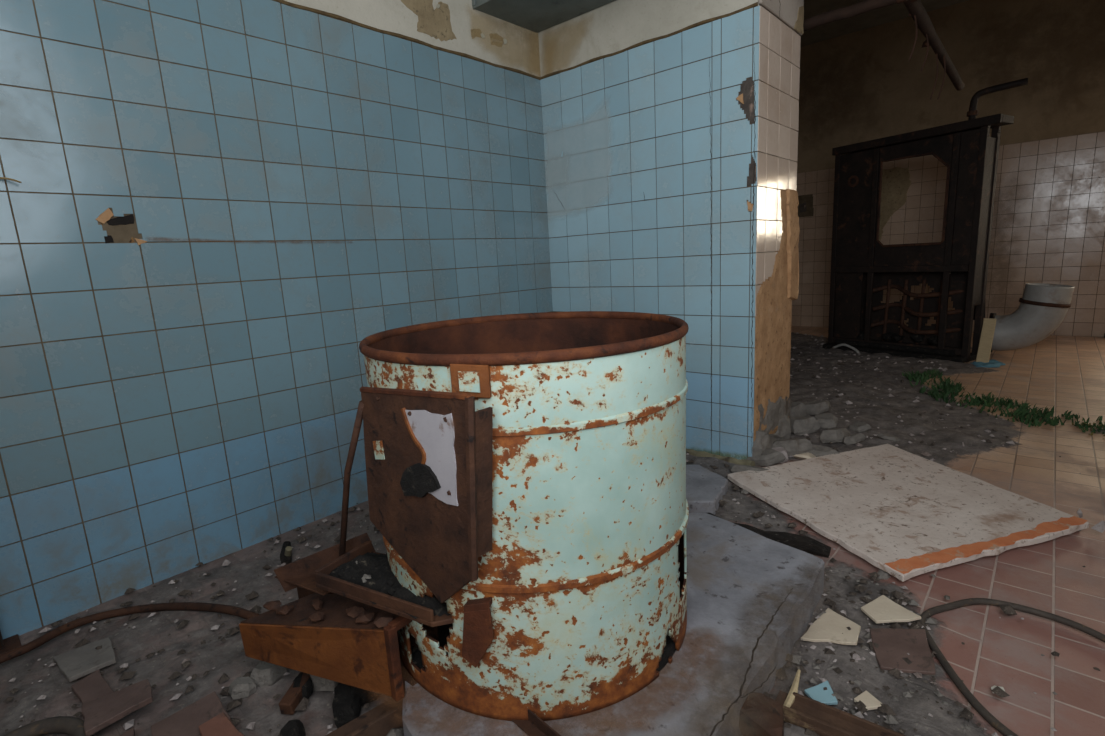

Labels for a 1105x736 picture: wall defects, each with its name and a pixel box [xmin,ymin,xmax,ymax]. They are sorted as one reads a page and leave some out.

peeling [401,0,457,42]
peeling [471,29,507,47]
spalling [95,208,134,243]
flaking render [752,189,800,467]